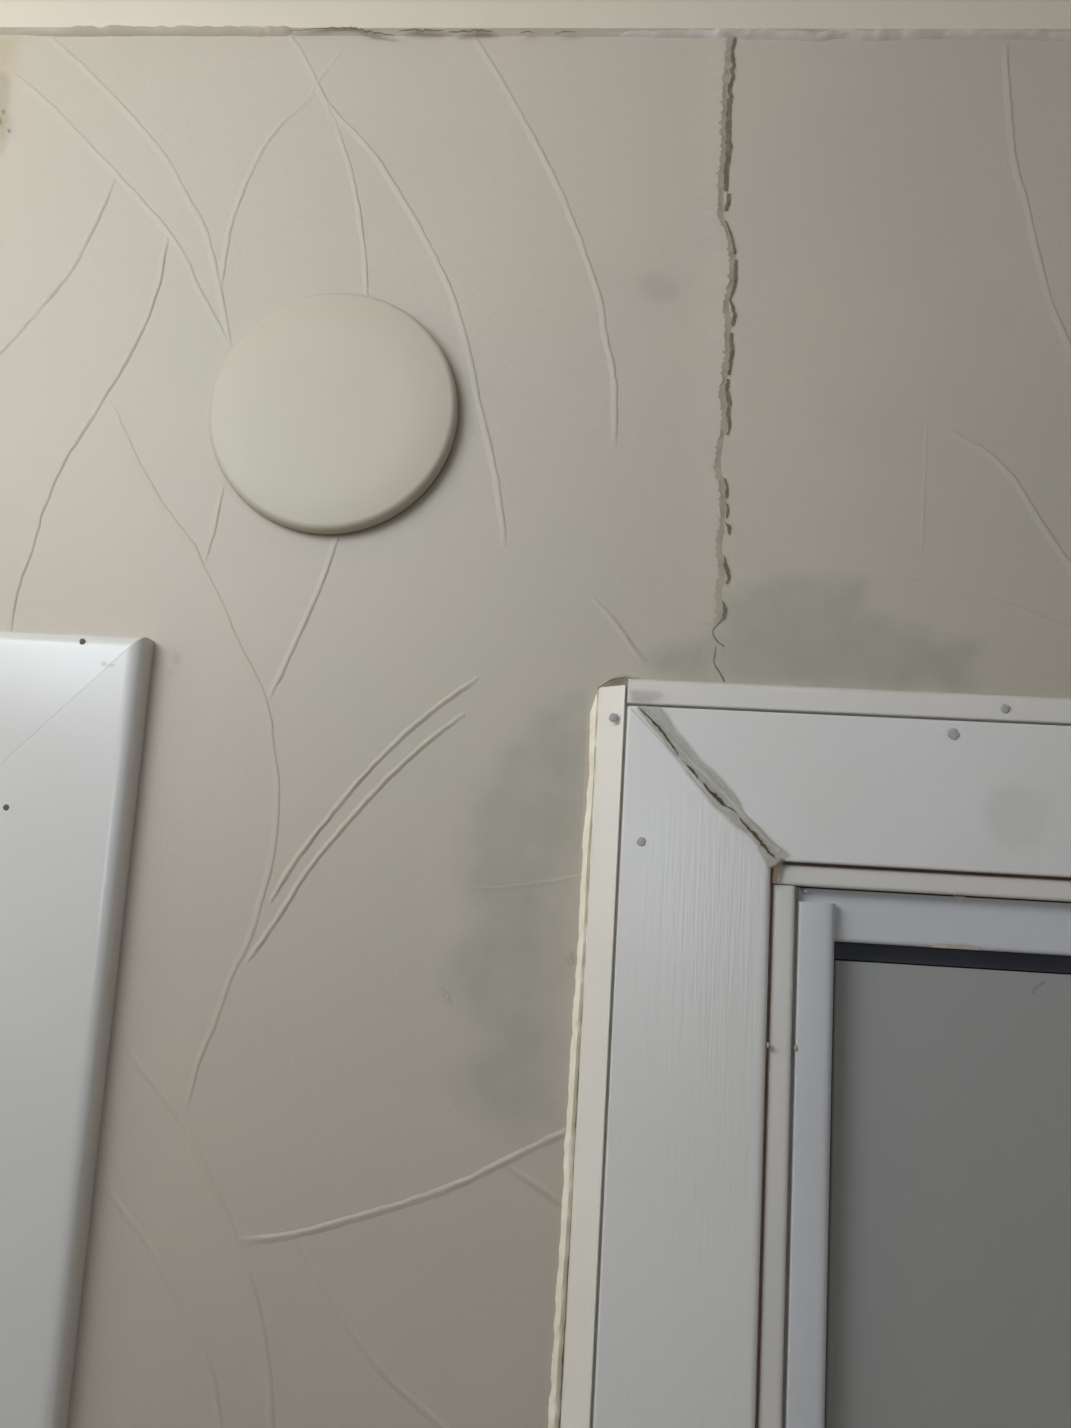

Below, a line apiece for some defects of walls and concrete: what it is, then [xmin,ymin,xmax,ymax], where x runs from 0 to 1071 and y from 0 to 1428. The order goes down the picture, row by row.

crack [289,26,577,36]
crack [677,37,737,682]